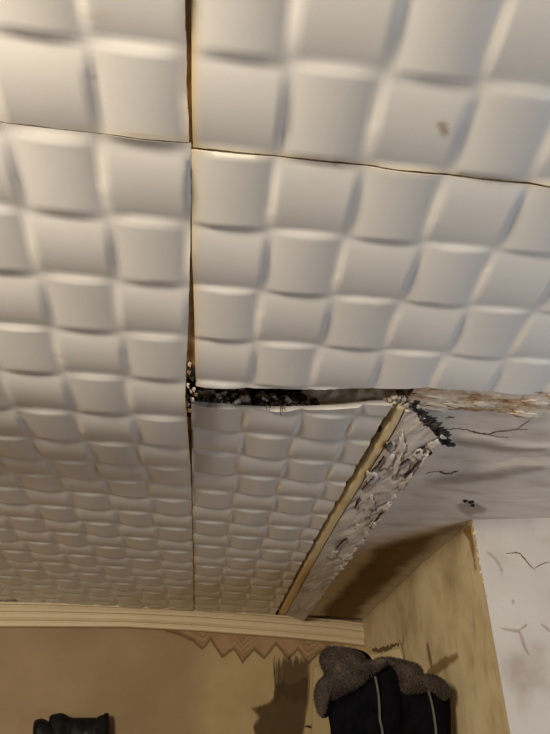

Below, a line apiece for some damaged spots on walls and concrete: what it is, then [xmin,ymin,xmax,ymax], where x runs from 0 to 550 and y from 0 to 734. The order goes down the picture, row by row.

flaking render [185,362,221,417]
spalling [236,388,301,405]
crack [446,416,530,438]
flaking render [326,387,550,582]
crack [506,552,548,573]